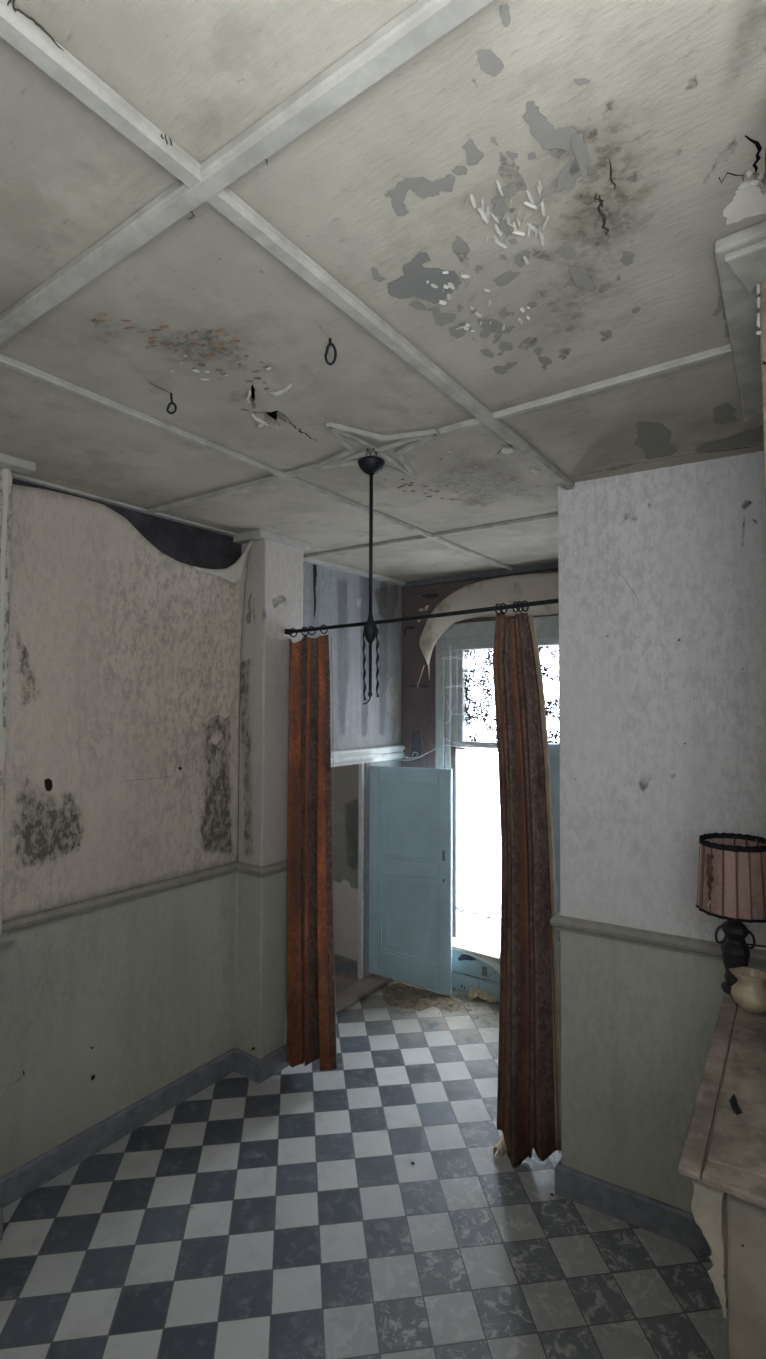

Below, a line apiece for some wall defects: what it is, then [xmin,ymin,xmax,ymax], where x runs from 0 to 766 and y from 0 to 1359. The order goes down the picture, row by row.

peeling [500,4,510,27]
peeling [477,49,504,76]
peeling [371,101,611,374]
mould [201,662,251,852]
mould [15,782,81,864]